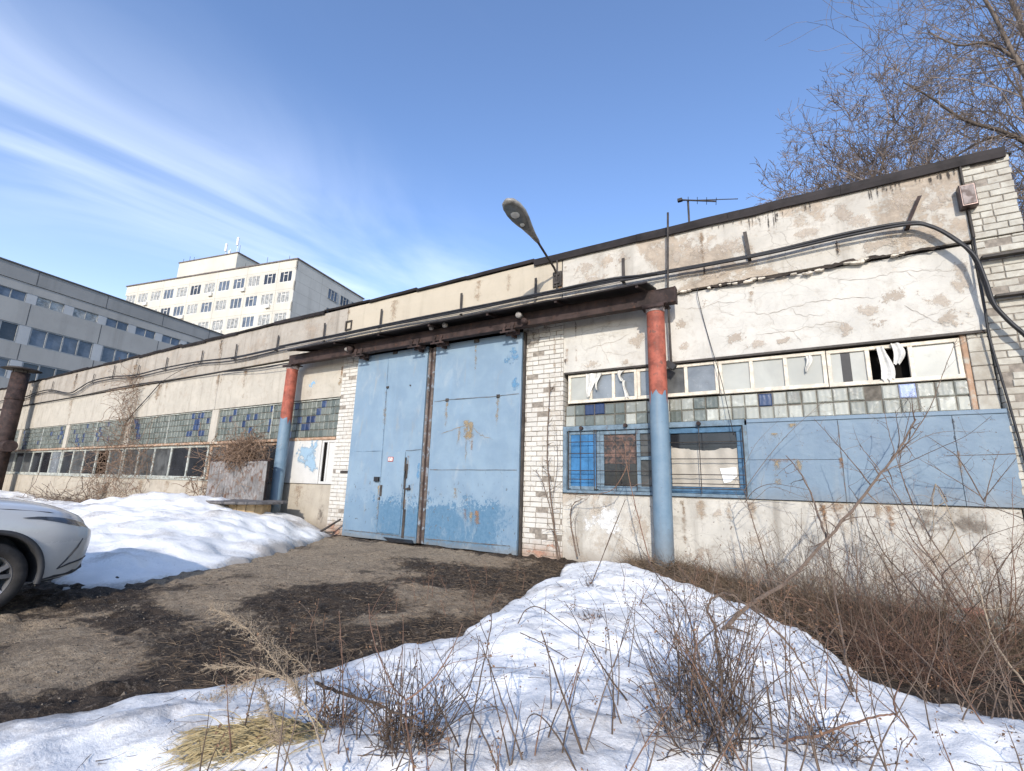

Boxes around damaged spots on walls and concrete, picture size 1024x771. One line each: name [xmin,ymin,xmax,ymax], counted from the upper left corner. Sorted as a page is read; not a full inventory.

spalling [672,231,950,307]
crack [684,269,951,335]
peeling [926,294,970,327]
peeling [296,440,318,472]